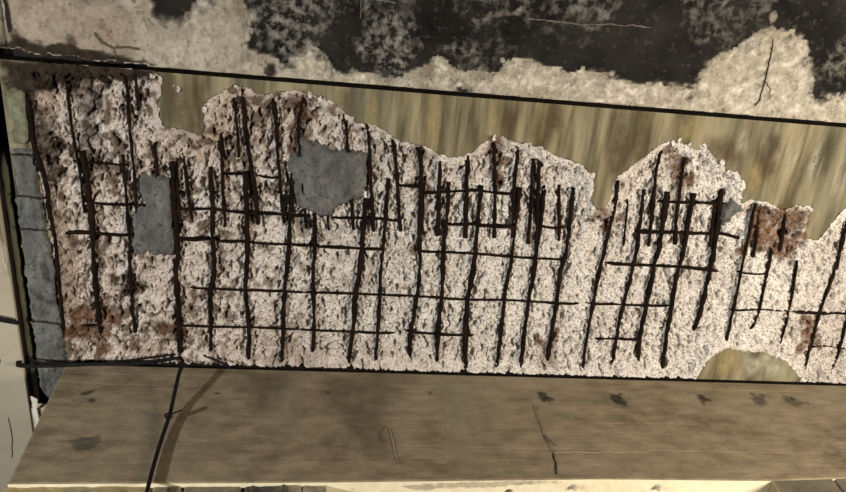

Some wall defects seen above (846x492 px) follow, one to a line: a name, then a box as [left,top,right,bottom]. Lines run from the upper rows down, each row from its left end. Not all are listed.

peeling [8,0,132,56]
leakage [284,47,383,84]
leakage [424,29,846,122]
crack [754,39,774,107]
spalling [25,64,846,384]
corrosion [735,206,810,259]
corrosion [110,270,147,297]
corrosion [65,294,119,360]
crack [534,407,643,474]